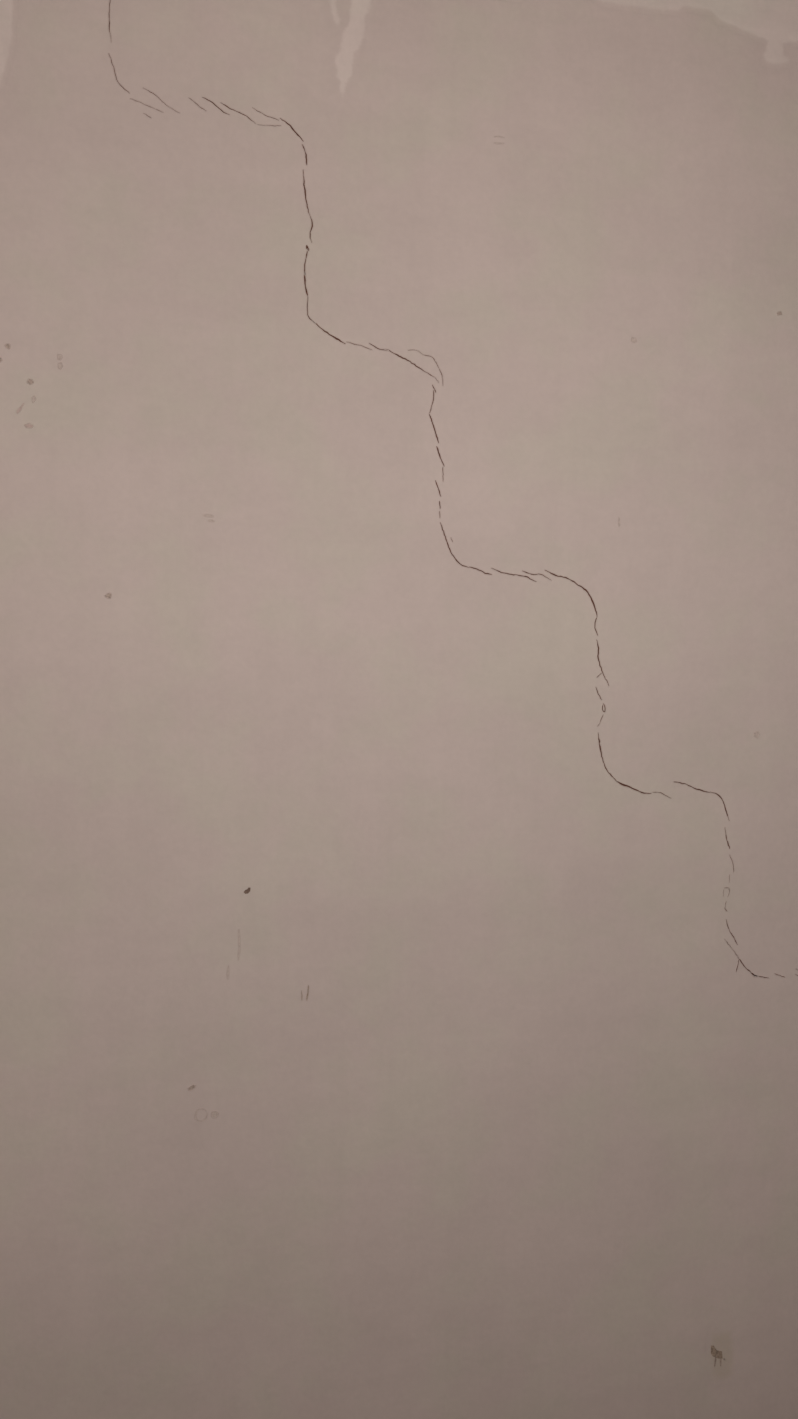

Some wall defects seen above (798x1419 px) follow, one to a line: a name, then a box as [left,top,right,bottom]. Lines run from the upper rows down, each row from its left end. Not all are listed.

crack [108,0,798,979]